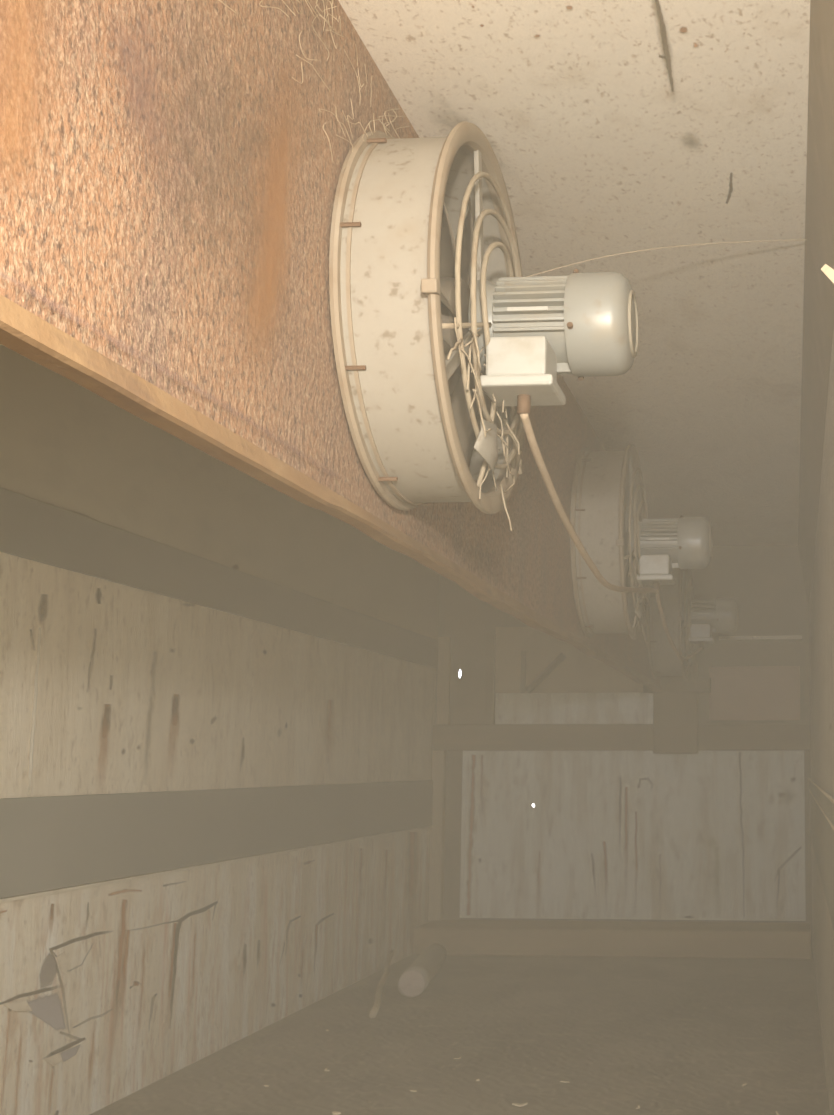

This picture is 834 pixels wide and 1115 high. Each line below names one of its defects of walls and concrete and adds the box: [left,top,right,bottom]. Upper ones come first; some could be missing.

peeling [0,931,108,1066]
rust [108,889,145,1010]